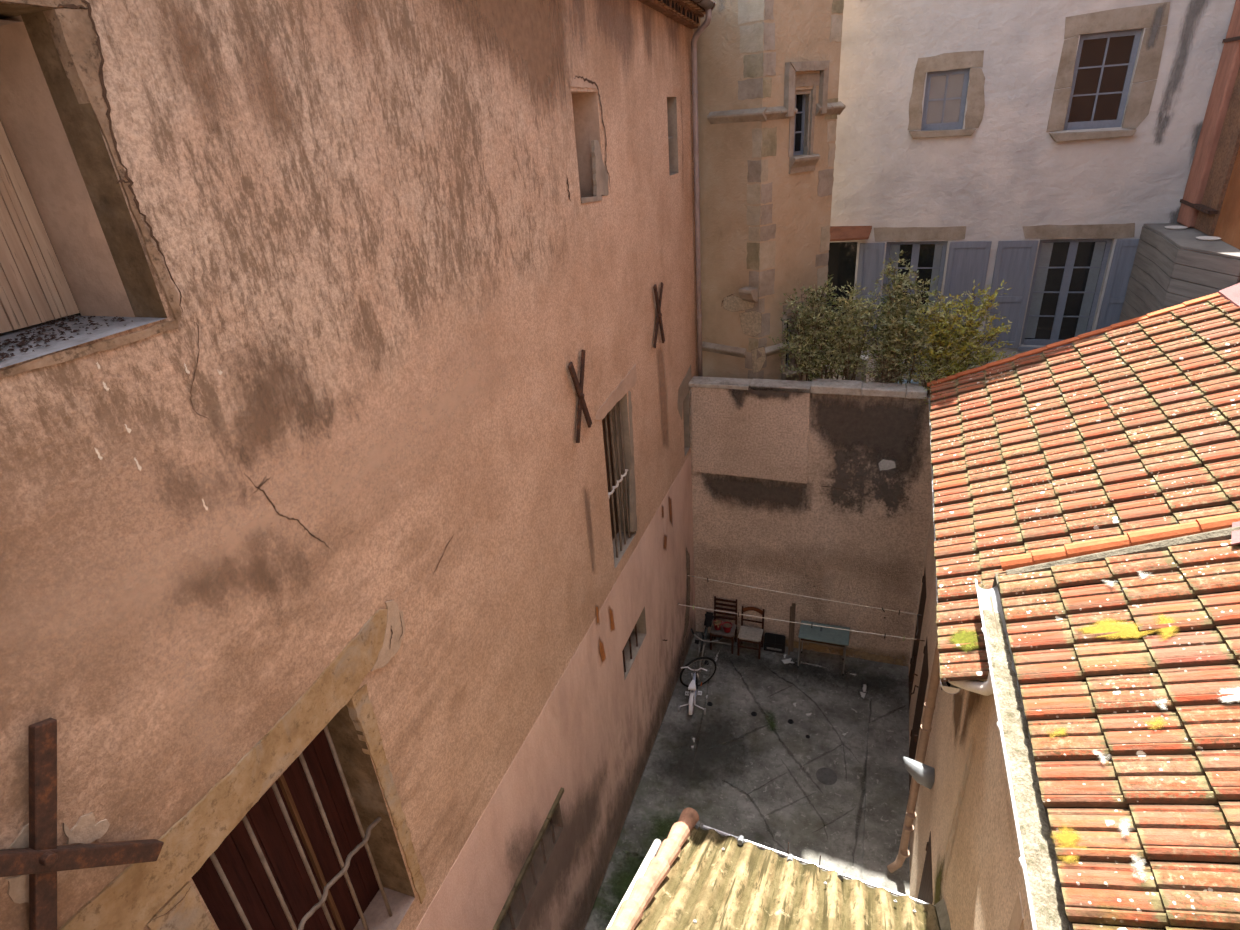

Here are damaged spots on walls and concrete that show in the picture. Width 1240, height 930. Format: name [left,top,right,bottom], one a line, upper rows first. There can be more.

damp [1147,5,1164,48]
damp [1155,0,1205,143]
crack [244,473,328,546]
damp [728,384,926,518]